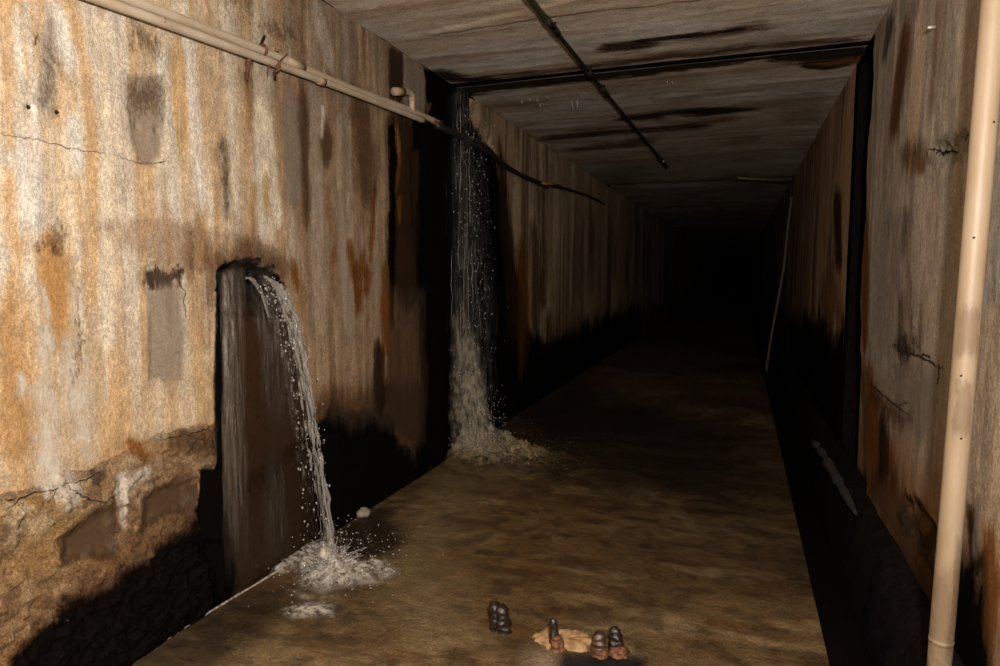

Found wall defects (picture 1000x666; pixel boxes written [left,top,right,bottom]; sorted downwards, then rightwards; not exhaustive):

leakage [636,27,744,42]
crack [0,133,162,163]
leakage [11,46,867,666]
crack [898,350,943,384]
crack [168,425,214,440]
crack [5,464,113,530]
spalling [141,480,191,532]
spalling [58,502,119,564]